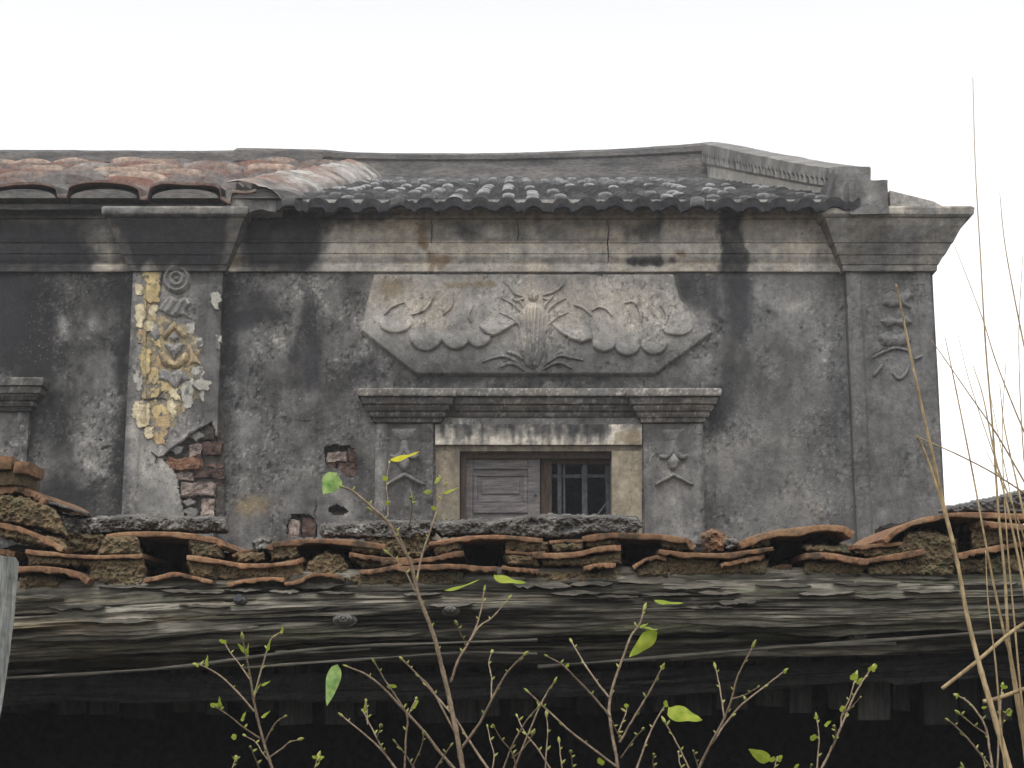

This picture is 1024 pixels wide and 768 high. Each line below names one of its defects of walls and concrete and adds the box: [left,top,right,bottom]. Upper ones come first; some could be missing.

leakage [627,256,675,266]
leakage [681,209,750,336]
peeling [132,272,226,517]
flaking render [324,445,357,477]
flaking render [287,514,317,539]